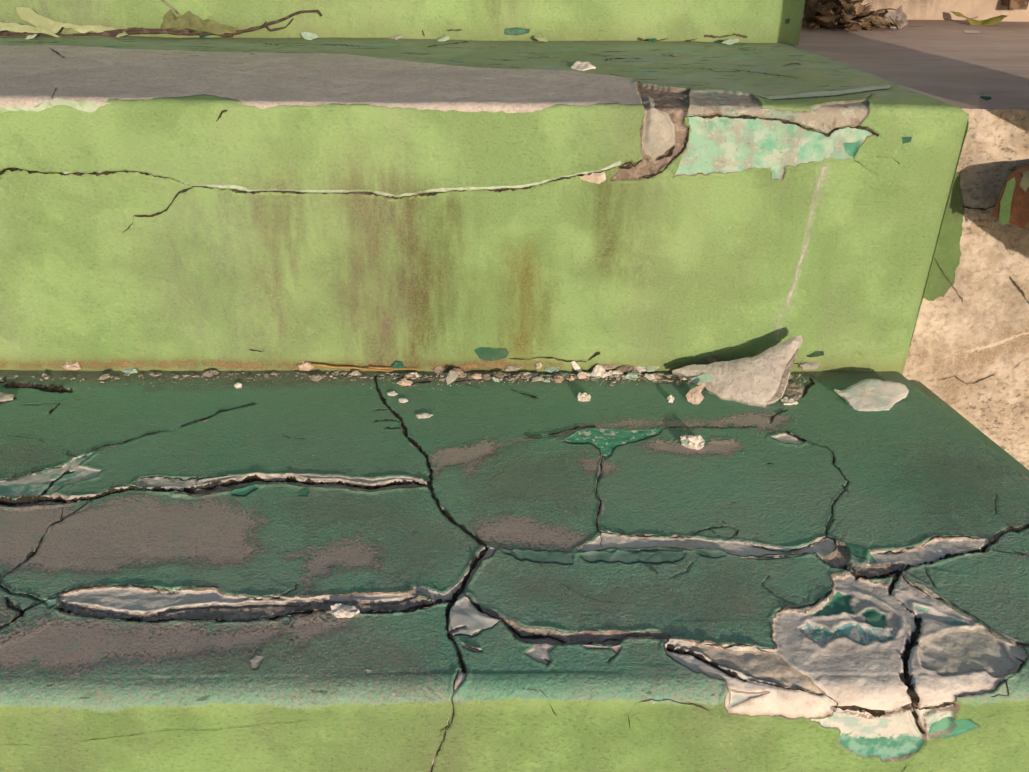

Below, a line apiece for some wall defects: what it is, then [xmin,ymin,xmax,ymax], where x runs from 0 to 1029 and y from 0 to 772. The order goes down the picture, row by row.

peeling [0,7,891,198]
crack [0,114,900,233]
crack [509,352,600,362]
peeling [554,382,803,479]
spalling [798,361,821,370]
crack [0,375,619,772]
spalling [0,435,1029,763]
crack [595,363,1029,734]